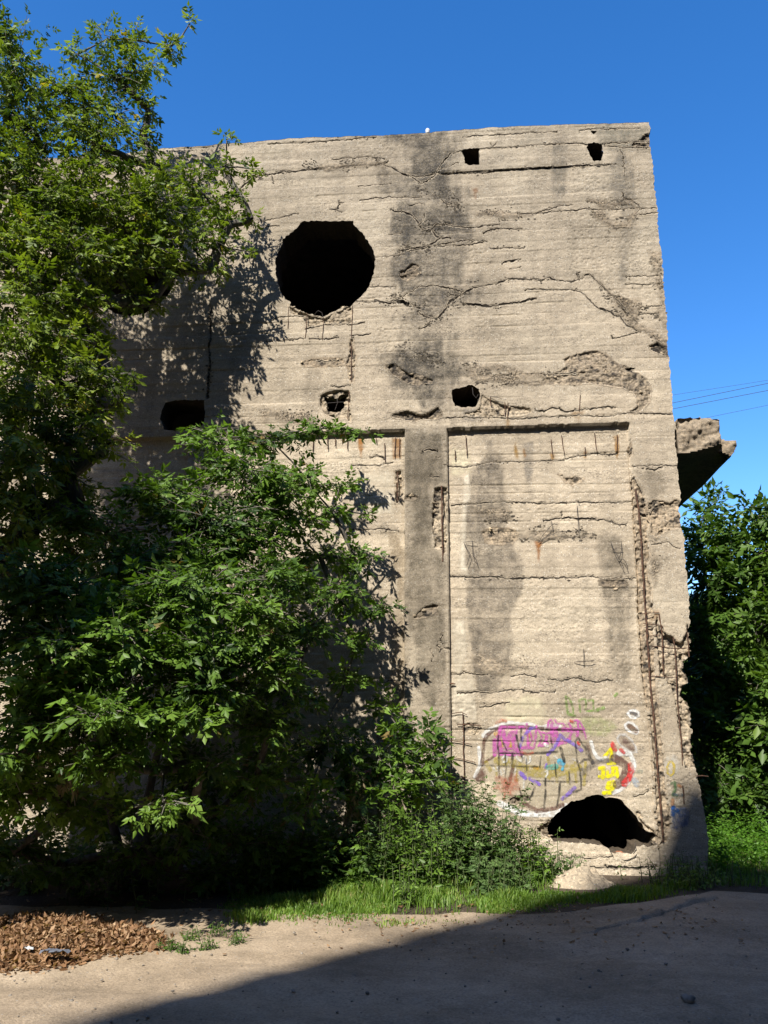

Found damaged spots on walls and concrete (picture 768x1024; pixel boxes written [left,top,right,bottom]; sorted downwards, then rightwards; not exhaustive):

damp [392,133,478,319]
crack [230,126,667,388]
spalling [261,304,357,429]
damp [392,341,459,407]
spalling [385,339,652,419]
spalling [376,437,449,561]
damp [452,453,489,484]
spalling [597,435,709,849]
spalling [534,818,553,842]